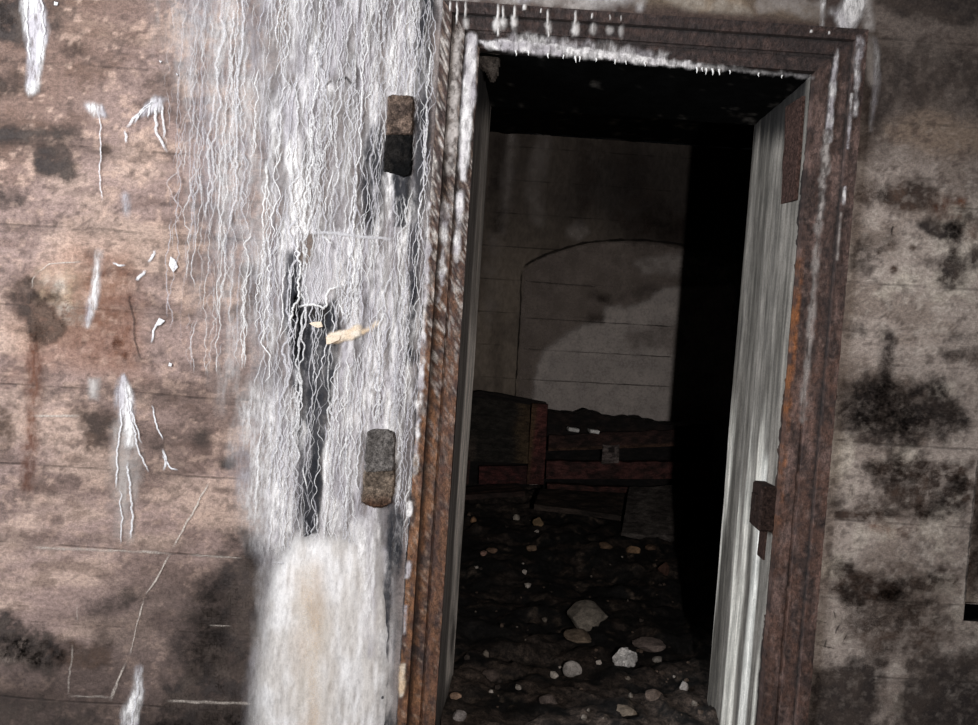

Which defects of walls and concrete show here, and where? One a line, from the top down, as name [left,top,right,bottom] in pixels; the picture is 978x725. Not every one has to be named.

water stain [0,0,58,93]
water stain [569,0,607,10]
water stain [0,126,75,182]
water stain [98,118,110,196]
water stain [860,181,978,289]
water stain [123,0,436,725]
water stain [80,374,147,539]
water stain [832,455,978,575]
water stain [0,612,111,676]
water stain [807,559,978,725]